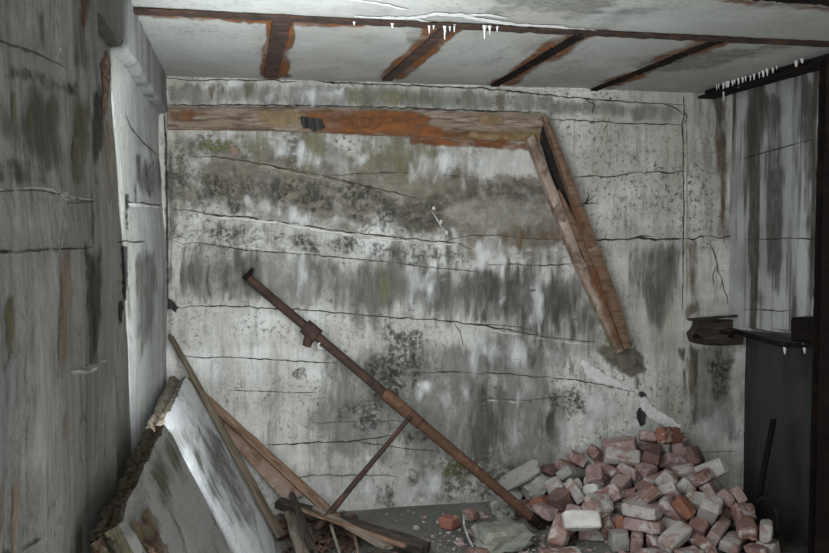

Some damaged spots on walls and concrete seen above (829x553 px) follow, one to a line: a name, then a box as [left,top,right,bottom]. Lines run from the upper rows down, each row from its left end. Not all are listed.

rust [149,15,365,80]
rust [383,21,461,79]
water stain [198,174,395,230]
crack [125,81,815,346]
water stain [748,74,817,298]
water stain [419,227,576,368]
water stain [630,245,679,326]
crack [188,355,335,363]
water stain [367,326,422,395]
crack [415,371,641,403]
flaking render [580,360,682,428]
crack [267,420,439,452]